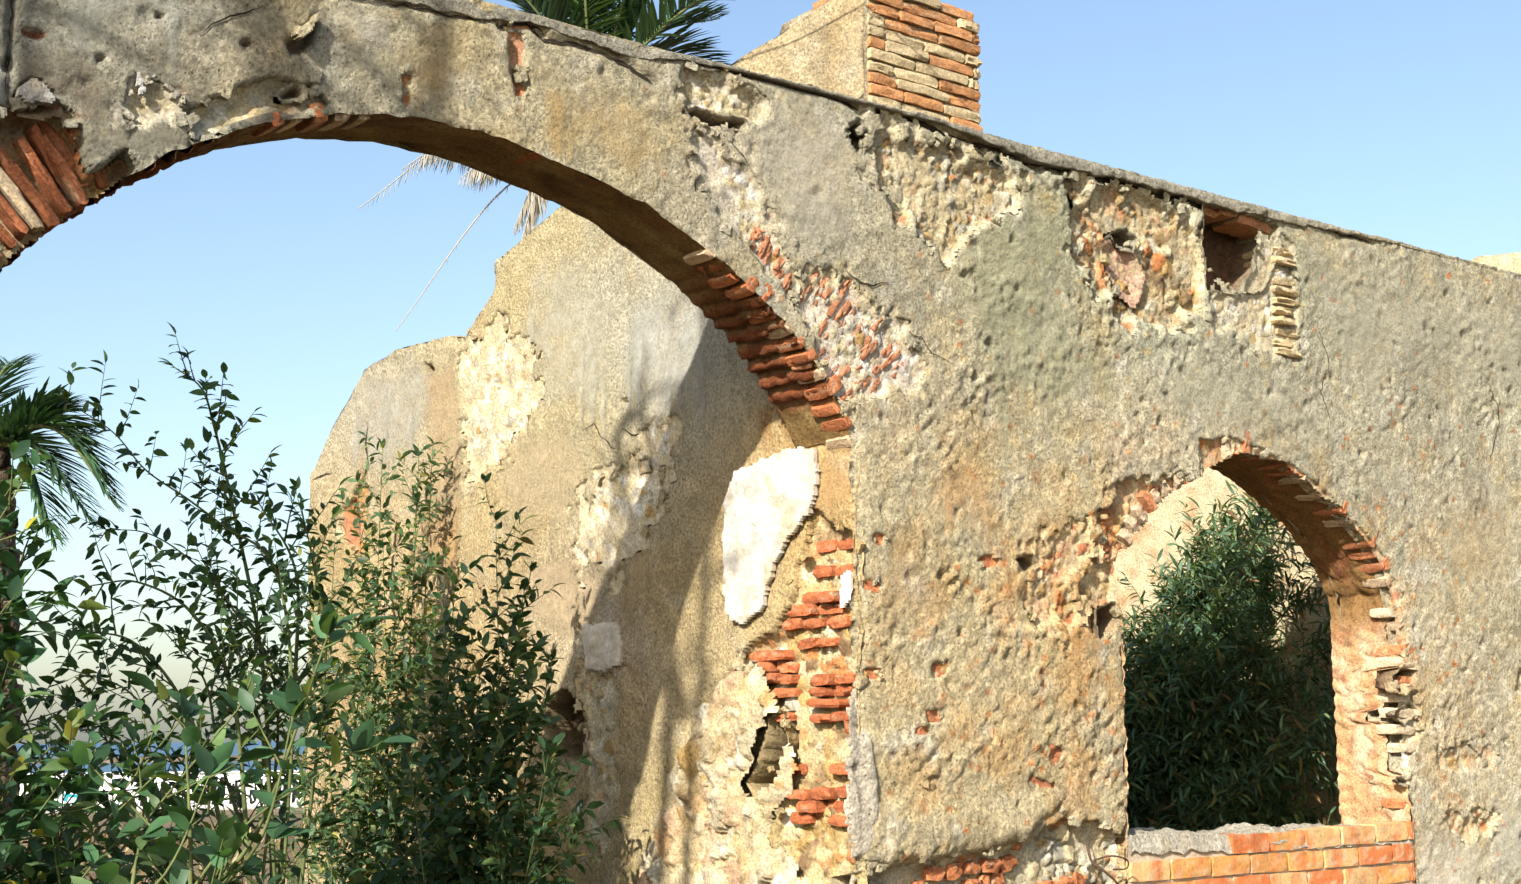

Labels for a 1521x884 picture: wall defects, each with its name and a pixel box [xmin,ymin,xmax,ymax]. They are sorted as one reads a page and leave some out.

peeling [16,24,48,41]
spalling [0,78,80,140]
spalling [110,67,324,145]
peeling [239,40,255,50]
flaking render [291,13,322,41]
spalling [675,60,931,421]
spalling [856,106,1030,269]
spalling [1060,169,1302,366]
spalling [568,415,685,595]
spalling [1019,435,1412,658]
flaking render [722,446,1124,884]